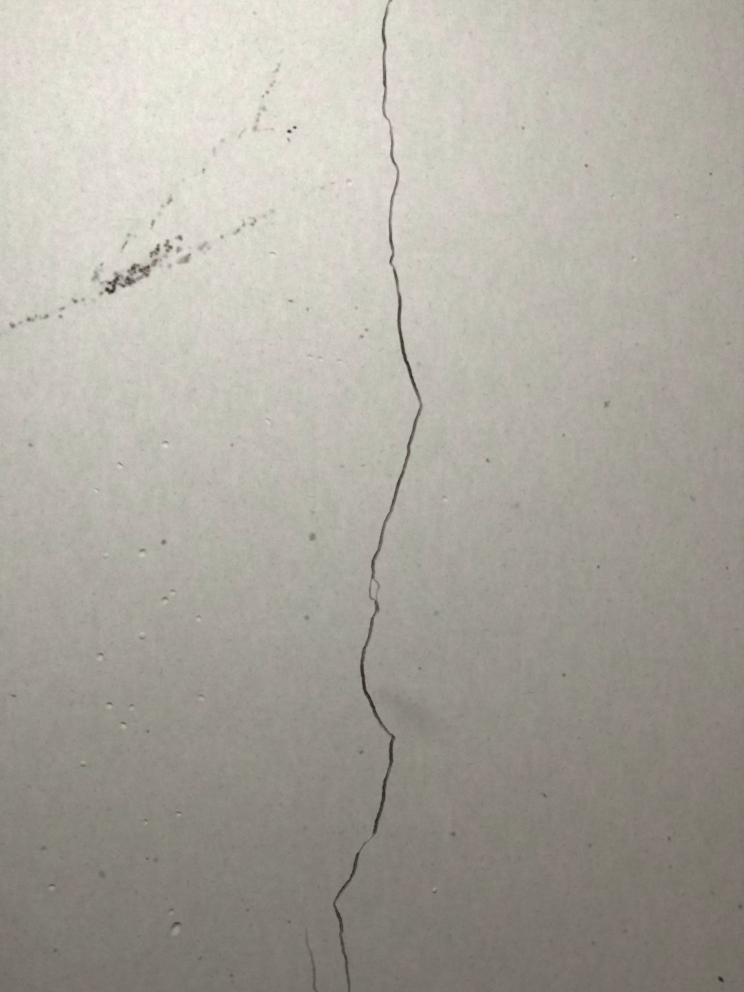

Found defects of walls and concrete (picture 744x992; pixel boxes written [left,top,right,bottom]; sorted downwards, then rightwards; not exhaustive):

crack [306,927,318,992]
crack [333,0,422,992]